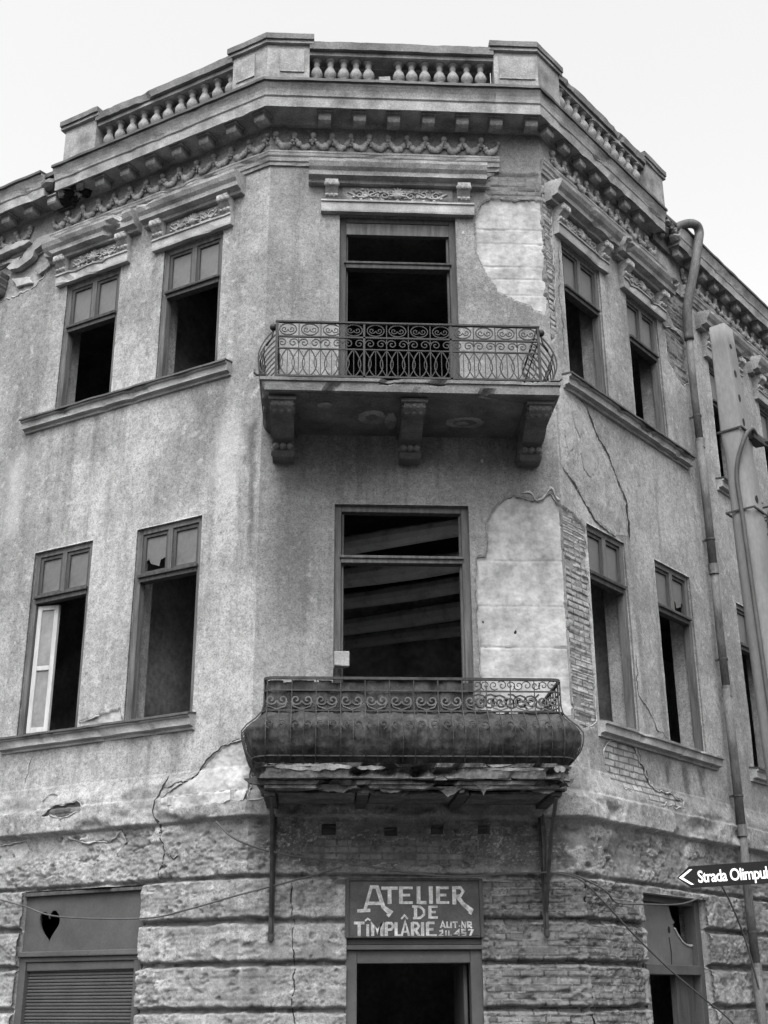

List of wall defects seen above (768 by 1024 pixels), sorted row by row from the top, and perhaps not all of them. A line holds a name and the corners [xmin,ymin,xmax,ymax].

flaking render [462,197,548,314]
crack [563,396,630,539]
flaking render [476,486,574,716]
crack [152,739,240,879]
flaking render [161,739,264,809]
spalling [268,763,409,796]
flaking render [417,780,490,798]
spalling [484,766,574,795]
flaking render [603,740,685,810]
crack [289,883,297,1023]